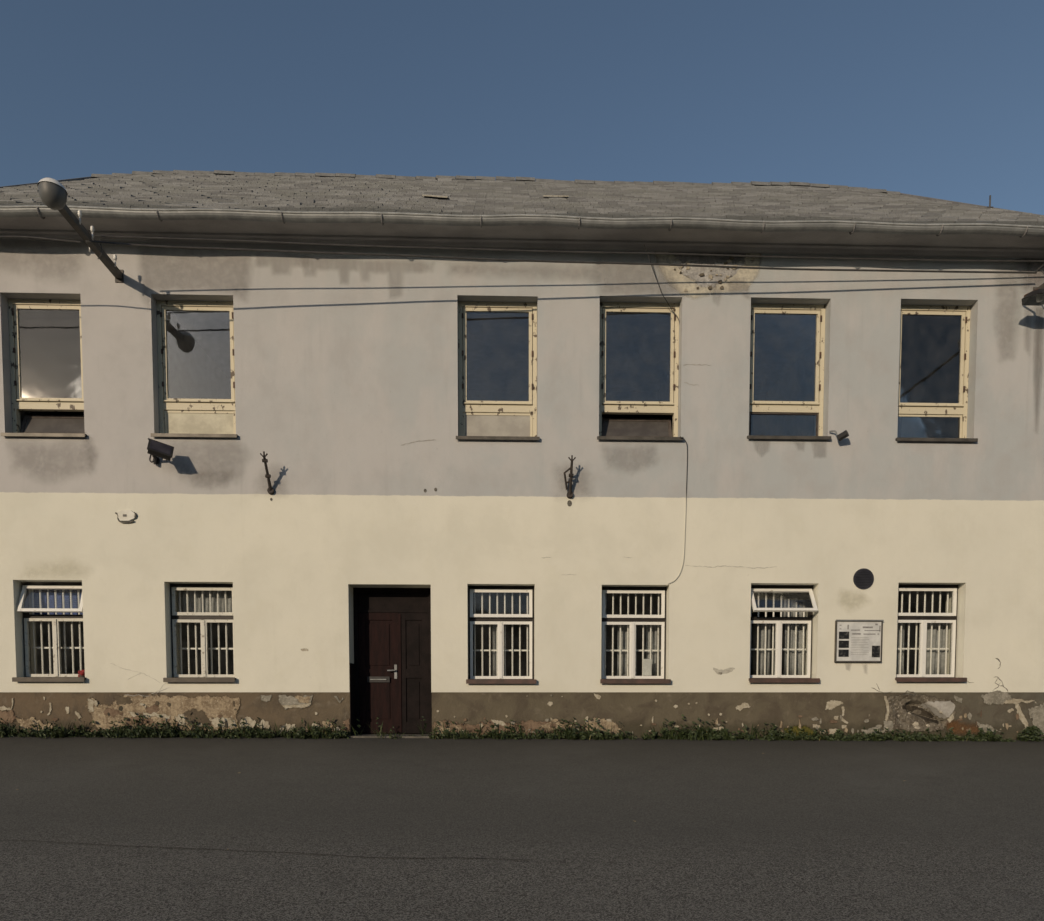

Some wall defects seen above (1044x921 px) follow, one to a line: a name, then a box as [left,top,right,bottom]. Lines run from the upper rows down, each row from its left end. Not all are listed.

flaking render [655,252,760,298]
peeling [0,693,350,734]
peeling [696,702,751,733]
flaking render [775,690,1044,735]